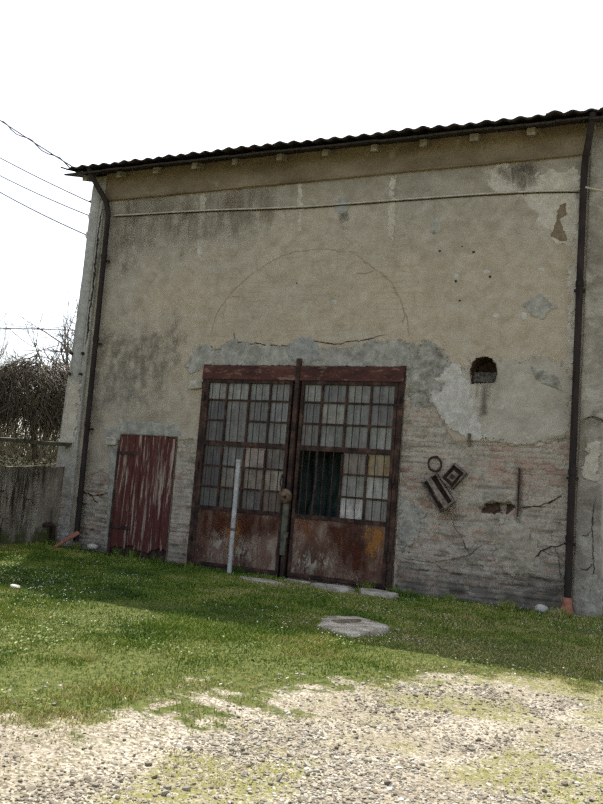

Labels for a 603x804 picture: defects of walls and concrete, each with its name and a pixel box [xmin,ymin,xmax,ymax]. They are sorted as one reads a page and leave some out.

flaking render [484,163,587,372]
flaking render [580,441,603,482]
flaking render [392,360,574,611]
crack [521,495,561,508]
rust [203,512,275,560]
rust [292,546,333,571]
rust [329,525,383,571]
crack [405,525,482,571]